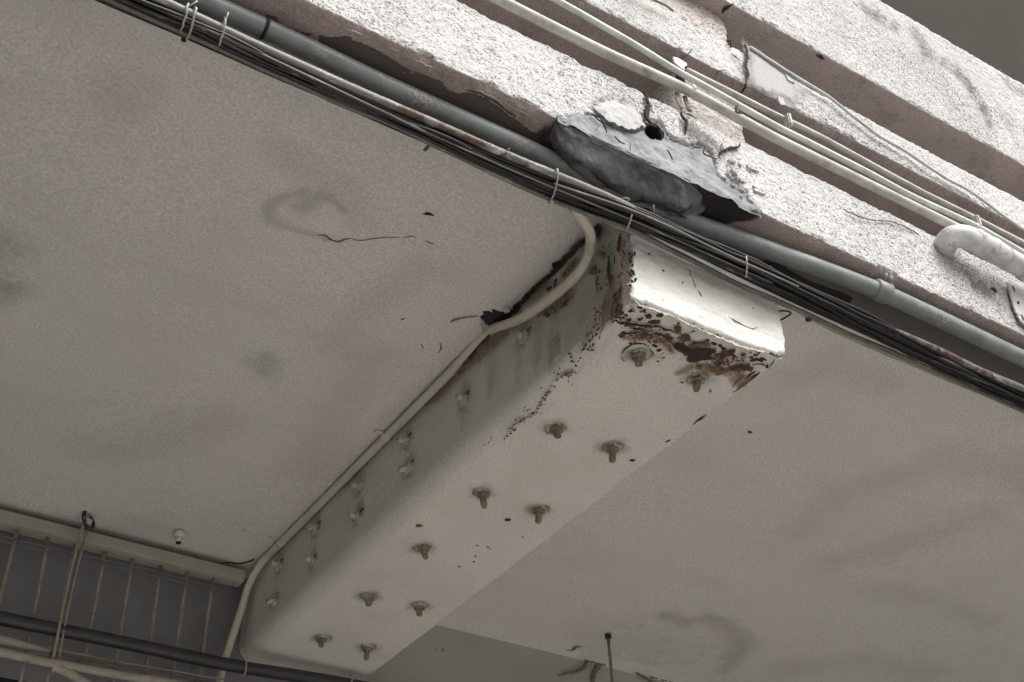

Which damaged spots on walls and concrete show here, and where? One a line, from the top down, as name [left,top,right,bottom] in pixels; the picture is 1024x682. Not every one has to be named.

flaking render [747,46,806,106]
spalling [258,8,766,219]
crack [317,235,433,244]
corrosion [484,233,637,445]
corrosion [672,322,767,393]